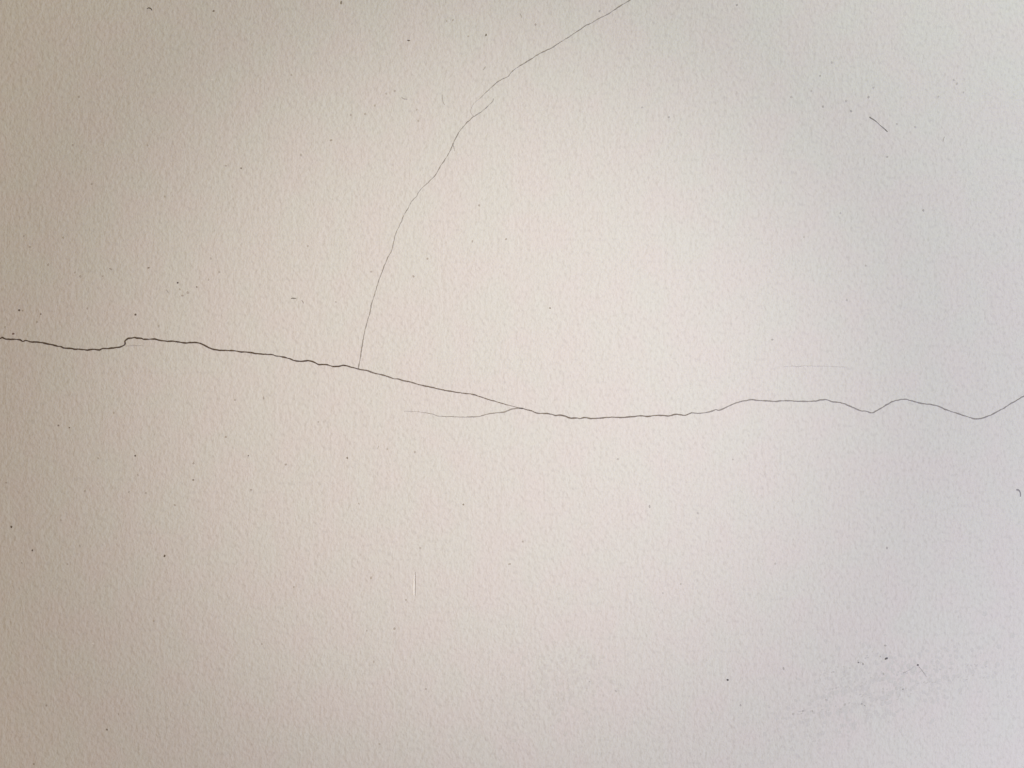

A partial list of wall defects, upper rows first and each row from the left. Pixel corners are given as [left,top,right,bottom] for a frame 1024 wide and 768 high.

crack [0,0,1024,420]